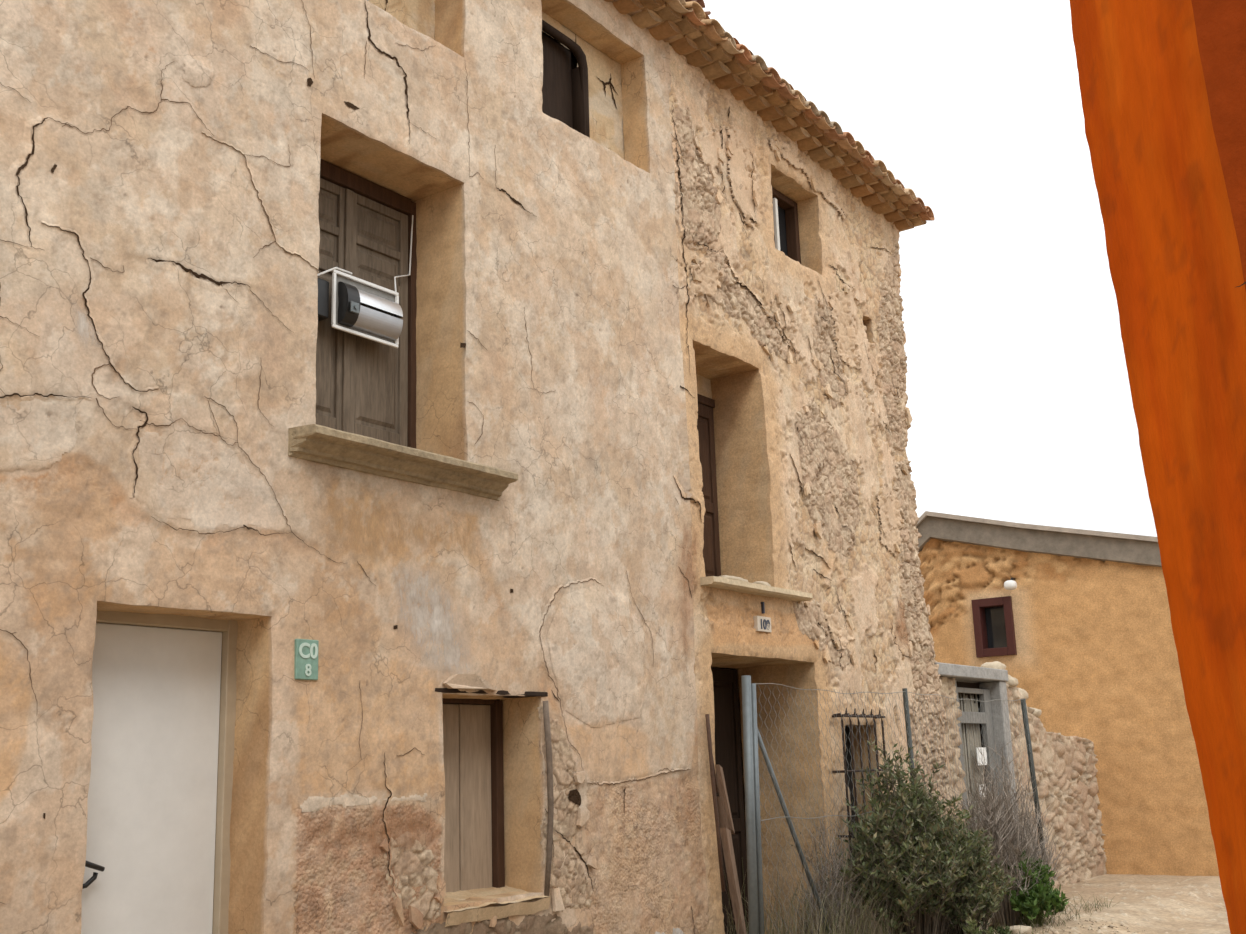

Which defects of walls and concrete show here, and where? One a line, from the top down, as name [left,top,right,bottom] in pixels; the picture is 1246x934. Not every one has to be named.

crack [251,0,315,78]
crack [360,0,436,144]
crack [0,62,376,586]
crack [673,475,704,522]
spalling [672,104,958,822]
crack [359,683,424,897]
crack [537,571,691,813]